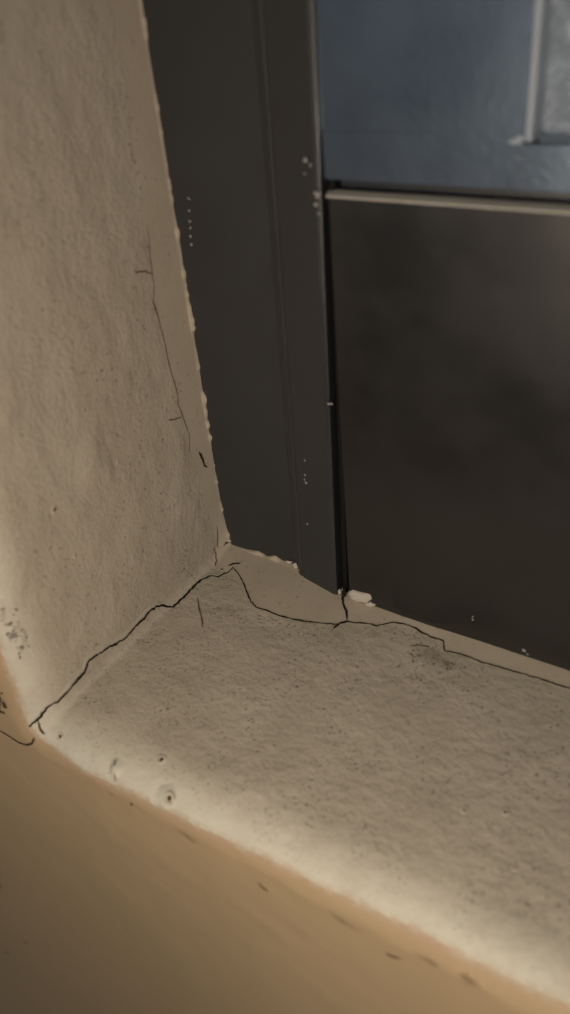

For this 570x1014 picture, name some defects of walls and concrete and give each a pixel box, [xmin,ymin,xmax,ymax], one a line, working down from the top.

crack [136,229,207,467]
crack [0,530,570,750]